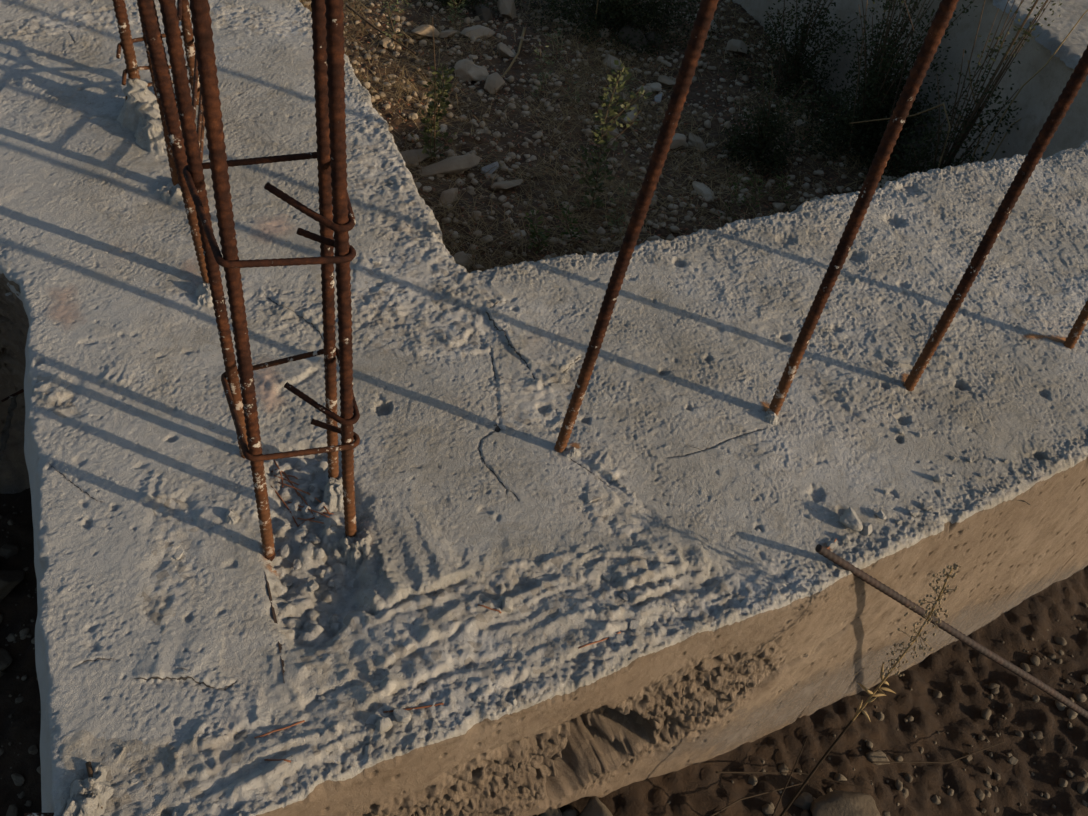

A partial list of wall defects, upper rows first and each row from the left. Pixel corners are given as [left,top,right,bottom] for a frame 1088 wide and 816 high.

crack [486,301,535,379]
rust [1026,334,1067,344]
crack [478,405,517,497]
crack [135,668,240,690]